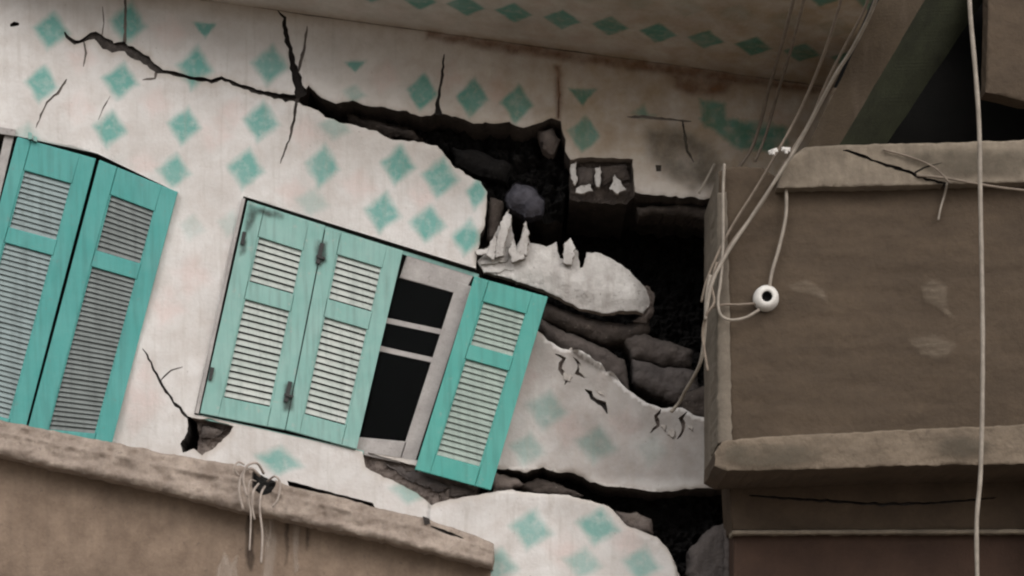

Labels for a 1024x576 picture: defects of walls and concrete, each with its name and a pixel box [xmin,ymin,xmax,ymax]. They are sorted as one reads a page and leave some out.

crack [36,0,570,248]
crack [627,115,694,163]
spalling [569,157,635,205]
crack [843,150,946,186]
flaking render [476,210,655,324]
crack [142,348,188,419]
flaking render [556,348,608,414]
flaking render [650,409,693,439]
spalling [363,453,478,505]
crack [749,495,996,507]